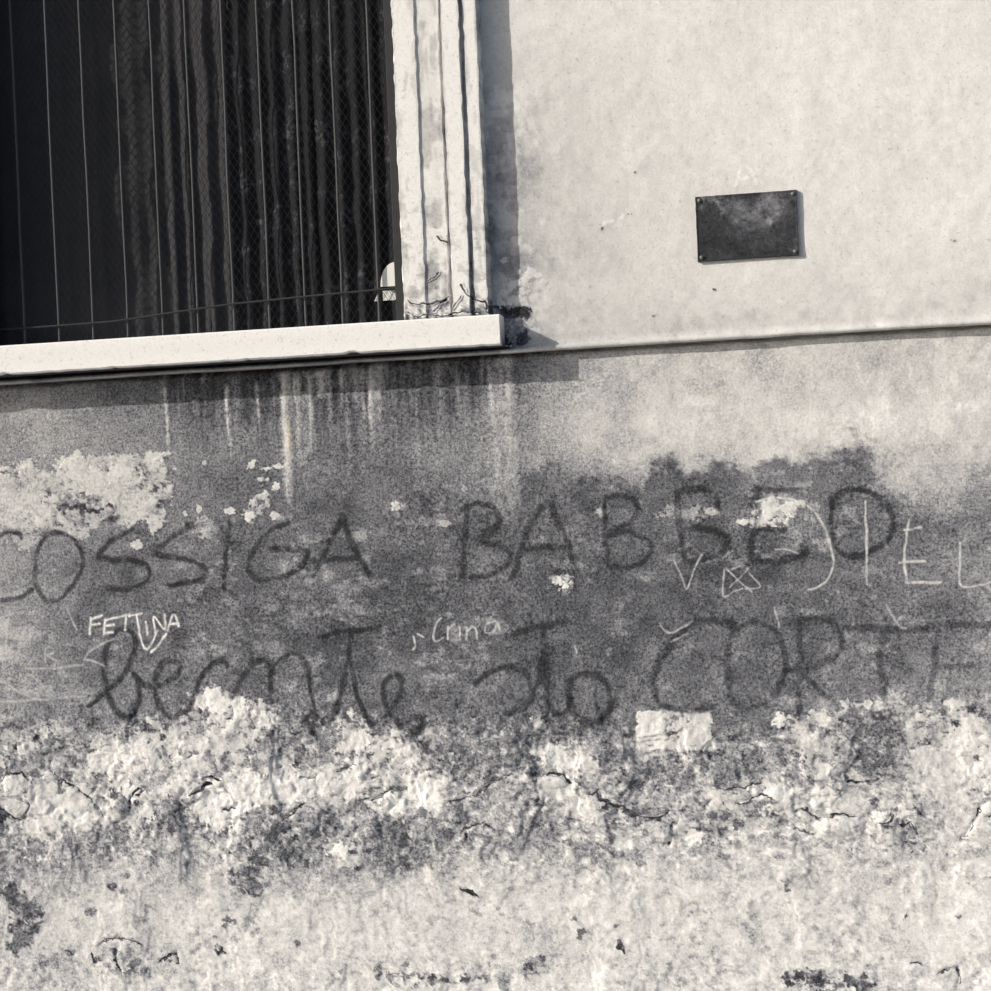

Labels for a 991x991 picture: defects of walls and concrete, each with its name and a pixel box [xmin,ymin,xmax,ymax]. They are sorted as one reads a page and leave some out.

peeling [491,235,549,348]
peeling [0,445,286,553]
water stain [0,352,991,750]
flaking render [0,679,991,964]
flaking render [369,959,493,991]
flaking render [512,948,555,986]
flaking render [775,963,885,991]
crack [908,960,962,986]